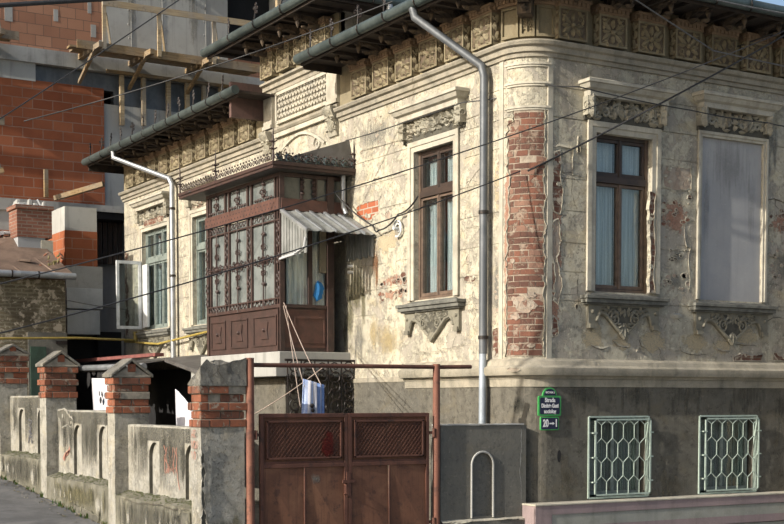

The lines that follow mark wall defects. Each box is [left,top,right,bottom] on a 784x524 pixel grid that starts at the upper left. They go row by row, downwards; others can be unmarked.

flaking render [356,199,400,251]
flaking render [492,109,564,358]
flaking render [646,164,693,294]
flaking render [378,271,407,304]
damp [344,276,392,358]
damp [54,412,108,459]
damp [118,502,181,524]